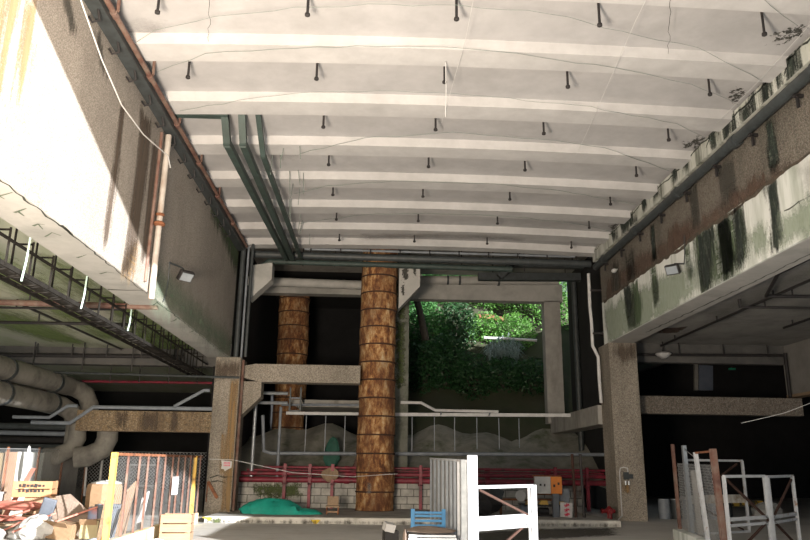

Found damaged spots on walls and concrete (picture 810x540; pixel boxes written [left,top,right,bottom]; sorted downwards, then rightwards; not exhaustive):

corrosion [606,163,790,297]
water stain [689,160,746,292]
water stain [764,119,784,252]